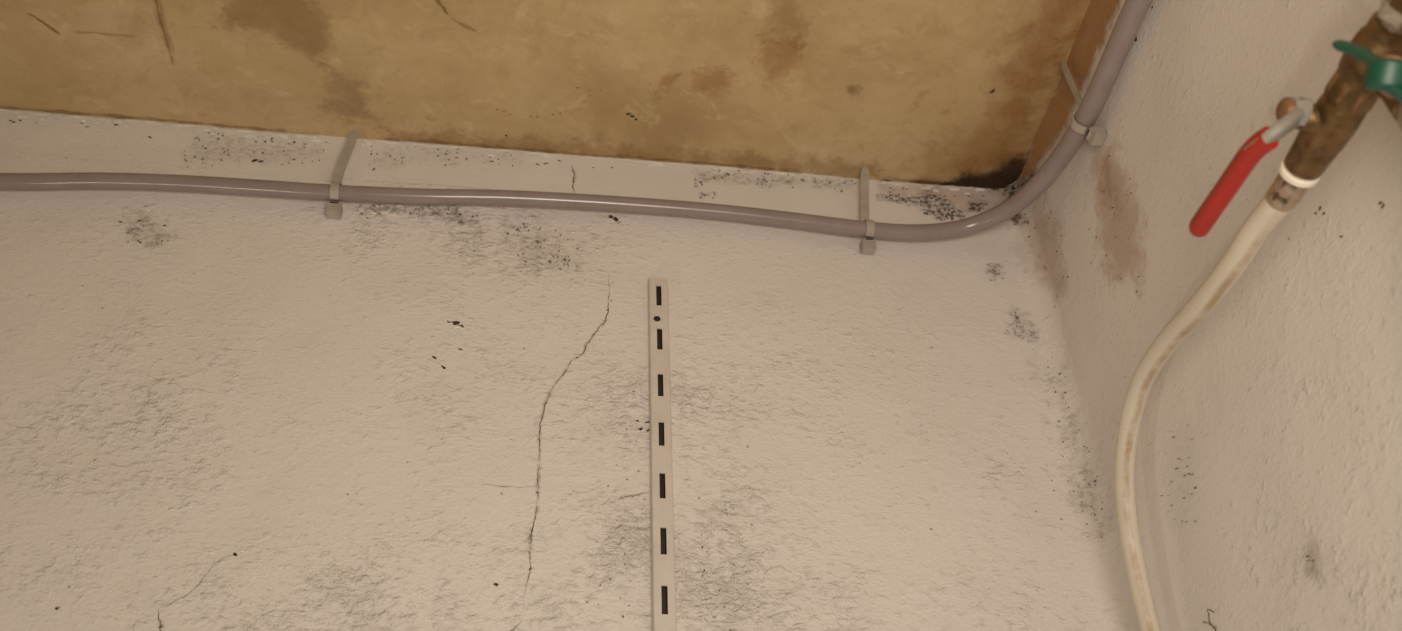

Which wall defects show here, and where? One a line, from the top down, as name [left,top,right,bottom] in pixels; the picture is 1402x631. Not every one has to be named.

leakage [882,159,1030,221]
leakage [506,223,579,270]
crack [483,272,610,631]
crack [158,554,234,631]